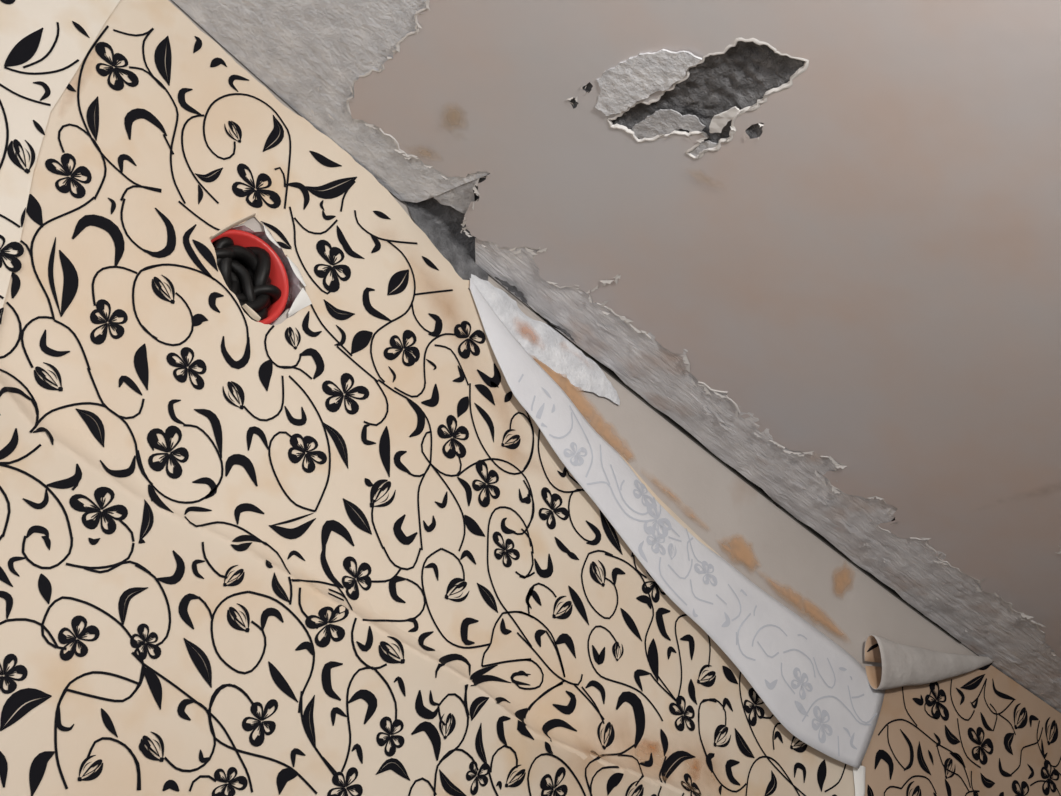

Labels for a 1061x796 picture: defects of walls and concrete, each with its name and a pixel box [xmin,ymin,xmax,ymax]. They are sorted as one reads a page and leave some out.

peeling [172,0,1061,713]